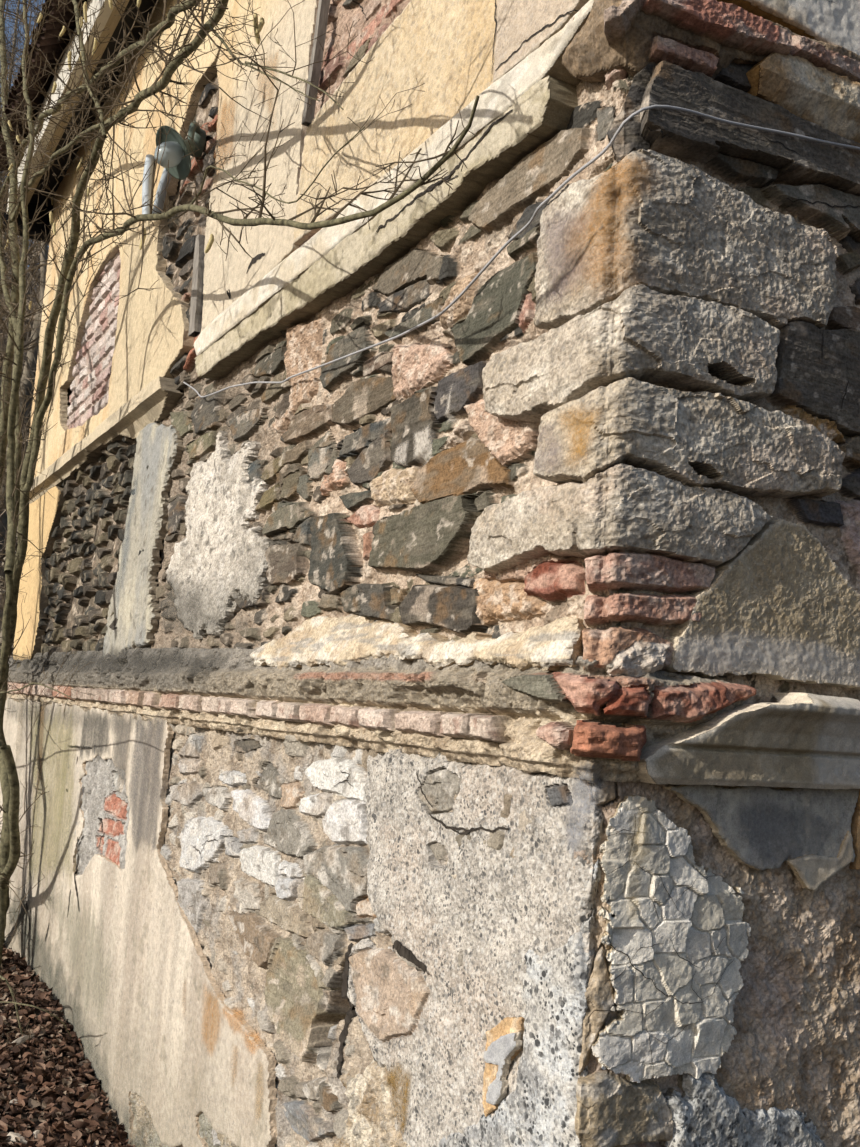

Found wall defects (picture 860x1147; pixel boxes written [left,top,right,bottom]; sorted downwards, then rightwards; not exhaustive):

water stain [8,704,163,847]
spalling [63,742,138,878]
spalling [430,794,534,879]
spalling [156,724,423,1147]
crack [605,814,733,1077]
spalling [573,774,860,1147]
spalling [128,1091,184,1147]